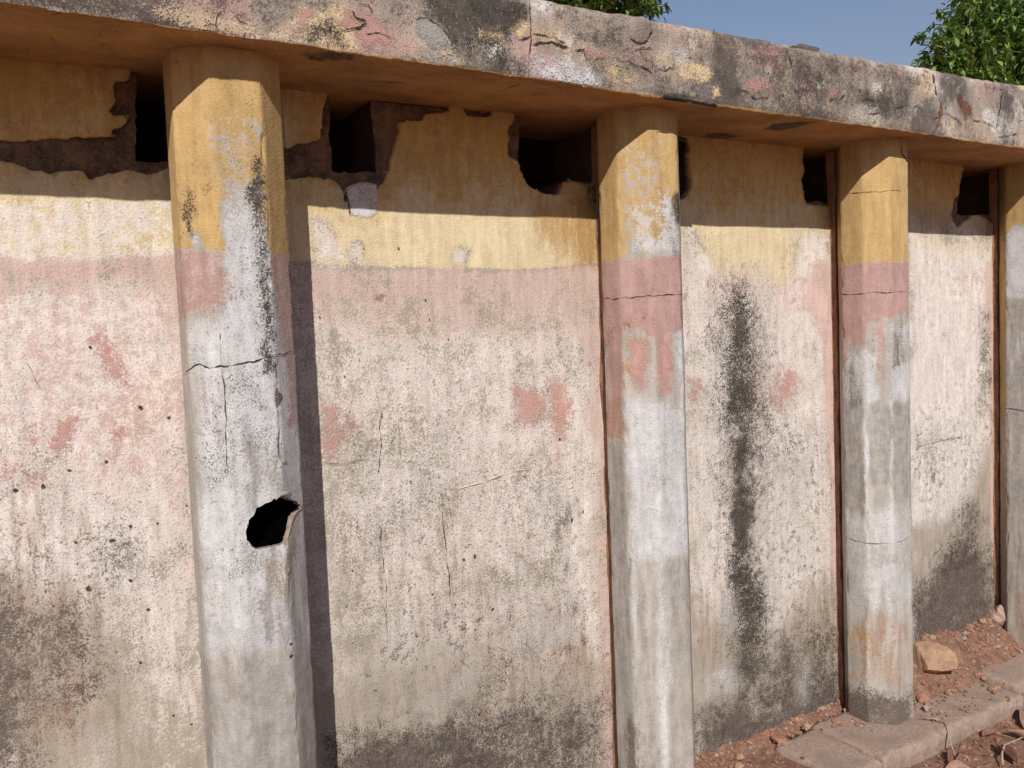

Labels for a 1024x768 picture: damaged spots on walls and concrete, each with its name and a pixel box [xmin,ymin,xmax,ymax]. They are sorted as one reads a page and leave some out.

spalling [0,74,169,178]
leakage [245,155,278,375]
spalling [284,97,445,220]
spalling [507,117,519,159]
spalling [951,187,990,225]
crack [185,336,295,472]
leakage [976,305,992,416]
spalling [246,491,302,549]
leakage [694,272,914,756]
leakage [912,492,995,643]